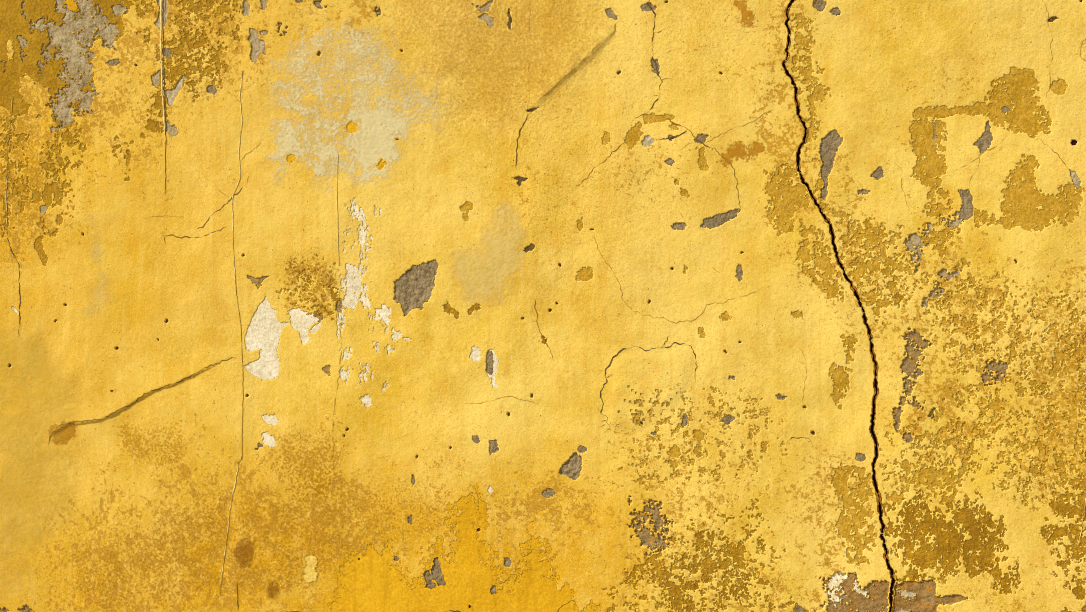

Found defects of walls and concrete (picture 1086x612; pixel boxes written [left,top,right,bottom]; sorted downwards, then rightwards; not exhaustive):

peeling [0,0,288,266]
peeling [245,198,438,408]
peeling [443,303,481,319]
peeling [460,201,473,222]
crack [595,240,756,432]
crack [636,0,898,612]
crack [220,455,253,607]